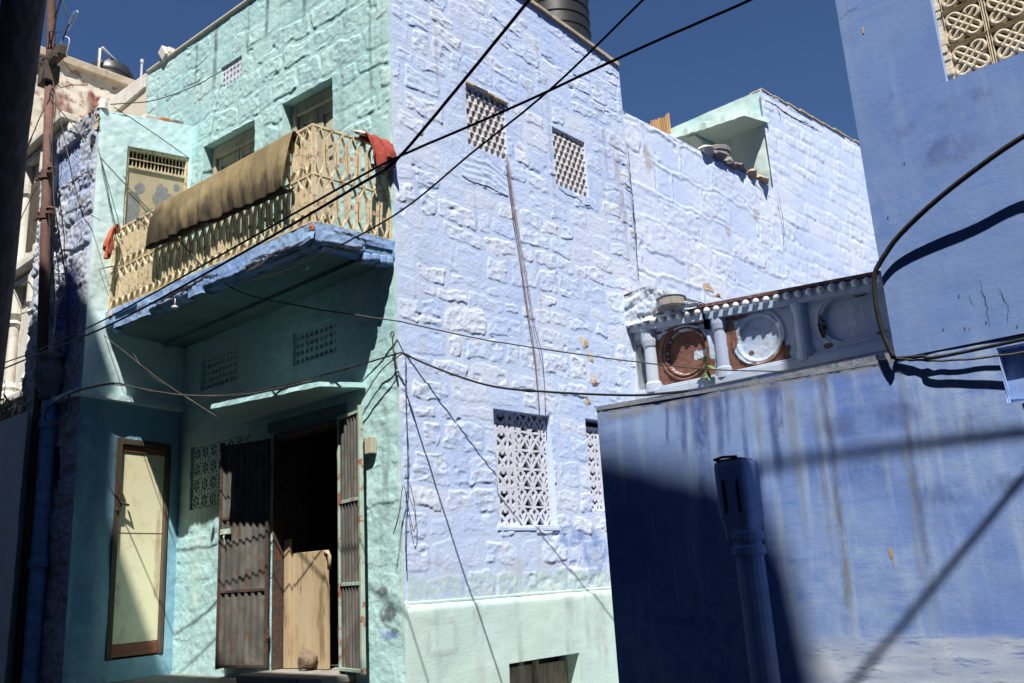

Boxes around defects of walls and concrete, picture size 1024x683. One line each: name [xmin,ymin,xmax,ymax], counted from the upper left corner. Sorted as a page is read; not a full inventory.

peeling [656,322,716,395]
peeling [726,306,791,370]